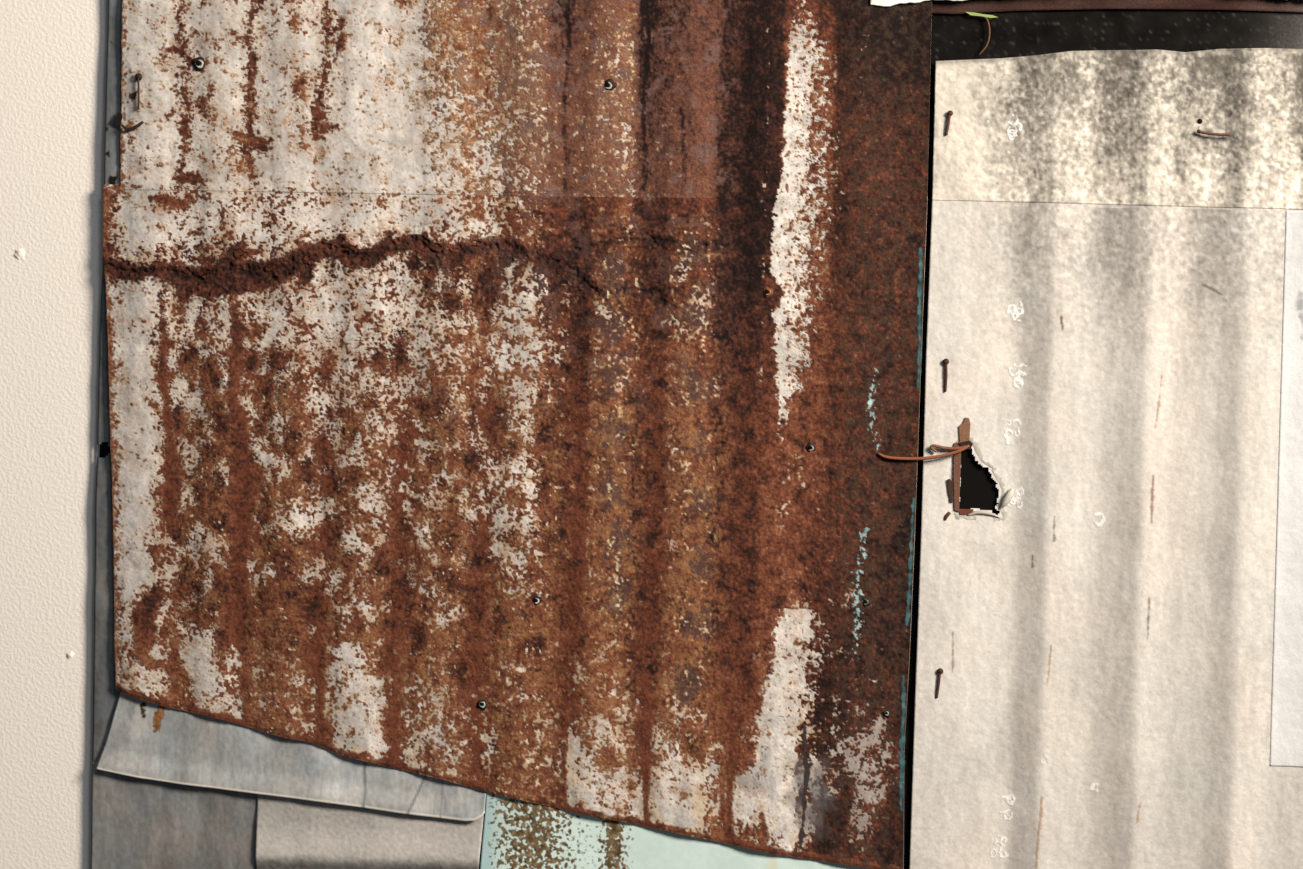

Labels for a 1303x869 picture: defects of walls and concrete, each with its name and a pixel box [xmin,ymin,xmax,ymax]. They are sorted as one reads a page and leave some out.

rust [103,0,931,869]
spalling [954,437,1014,521]